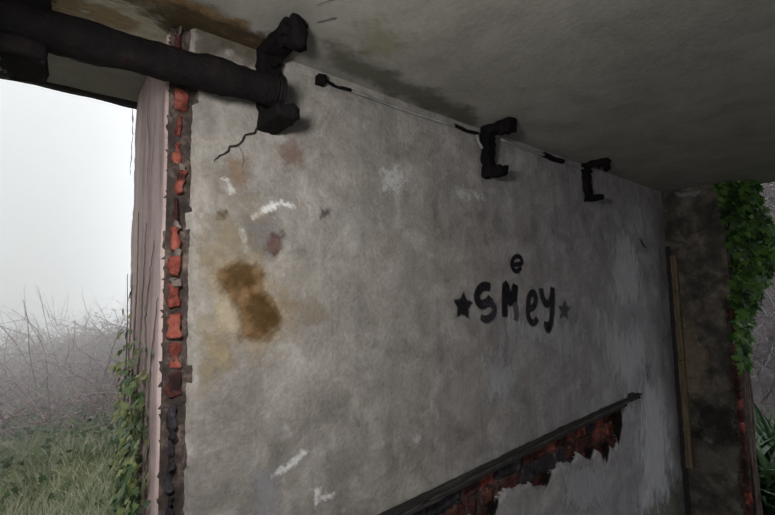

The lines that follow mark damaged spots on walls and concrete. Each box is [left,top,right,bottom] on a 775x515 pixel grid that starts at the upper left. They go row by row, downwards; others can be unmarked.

crack [214,127,257,168]
spalling [160,82,193,515]
spalling [412,410,622,515]